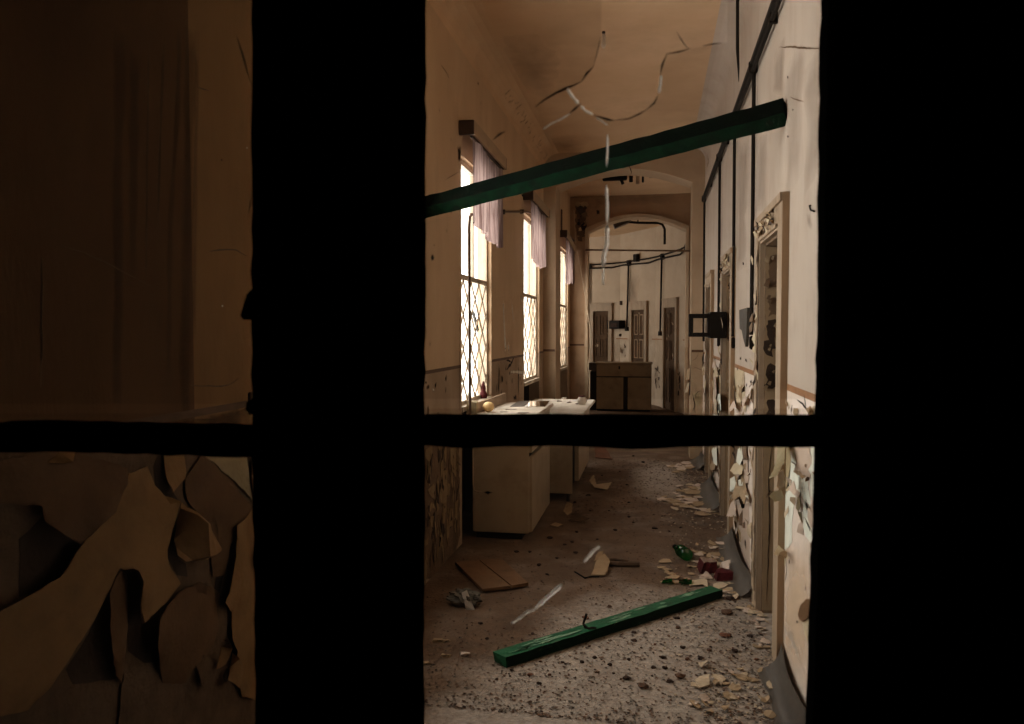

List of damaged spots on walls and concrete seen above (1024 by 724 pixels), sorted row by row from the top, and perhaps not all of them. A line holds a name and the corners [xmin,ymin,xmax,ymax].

peeling [655,208,815,415]
peeling [0,451,256,724]
peeling [708,446,814,611]
peeling [798,599,810,641]